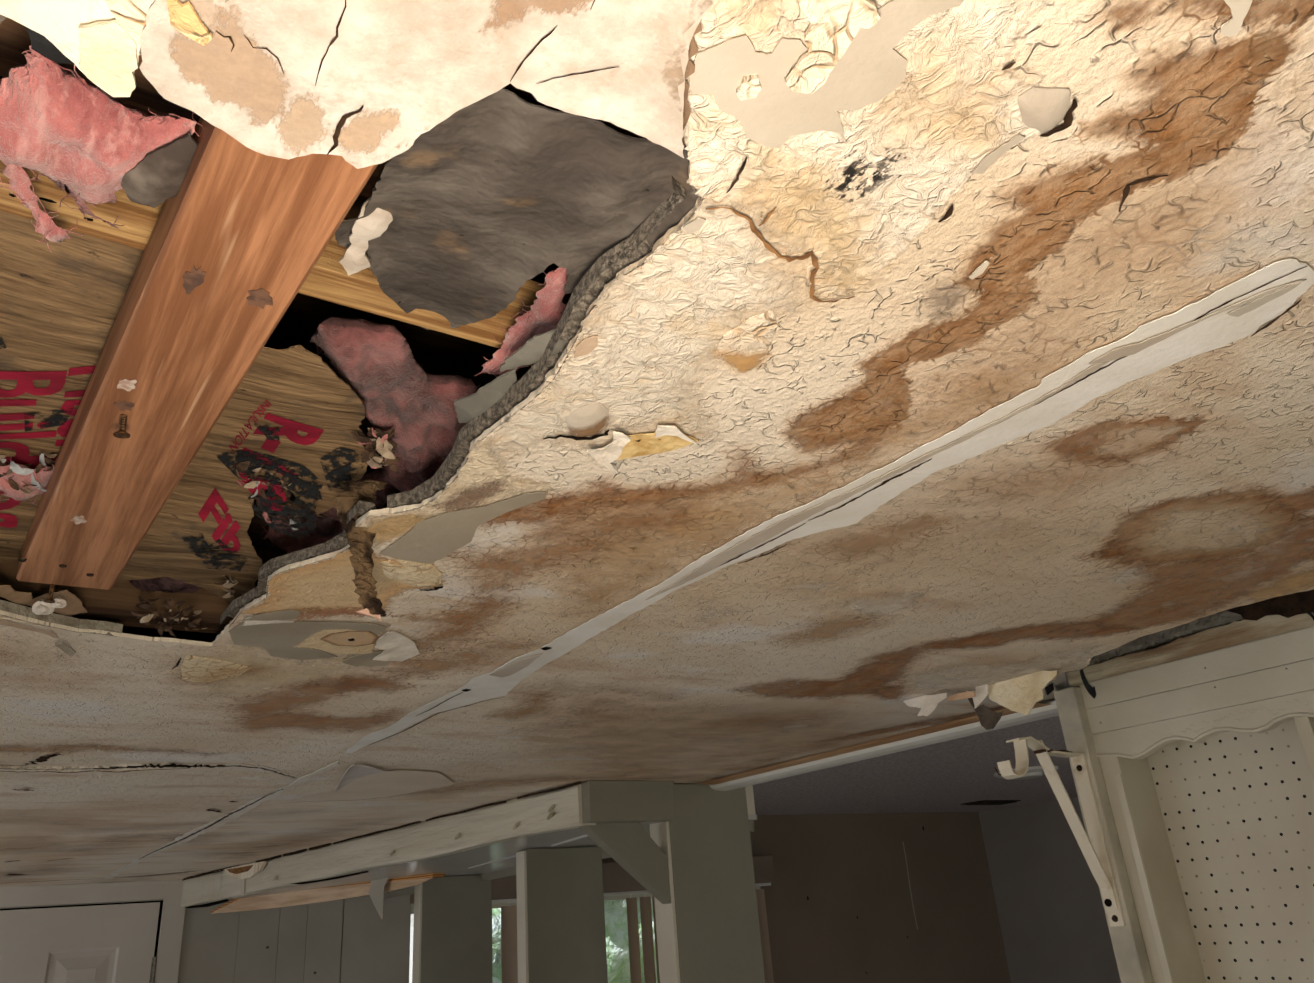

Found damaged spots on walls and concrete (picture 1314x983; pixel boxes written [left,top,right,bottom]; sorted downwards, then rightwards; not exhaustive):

peeling [1220,0,1253,37]
crack [706,156,855,302]
damp [183,265,206,294]
flaking render [220,0,1076,667]
damp [217,0,1314,732]
crack [1194,266,1307,337]
crack [718,458,932,567]
damp [182,534,246,571]
spalling [0,600,123,657]
damp [818,706,1006,748]
flaking render [965,670,1058,730]
crack [0,753,584,883]